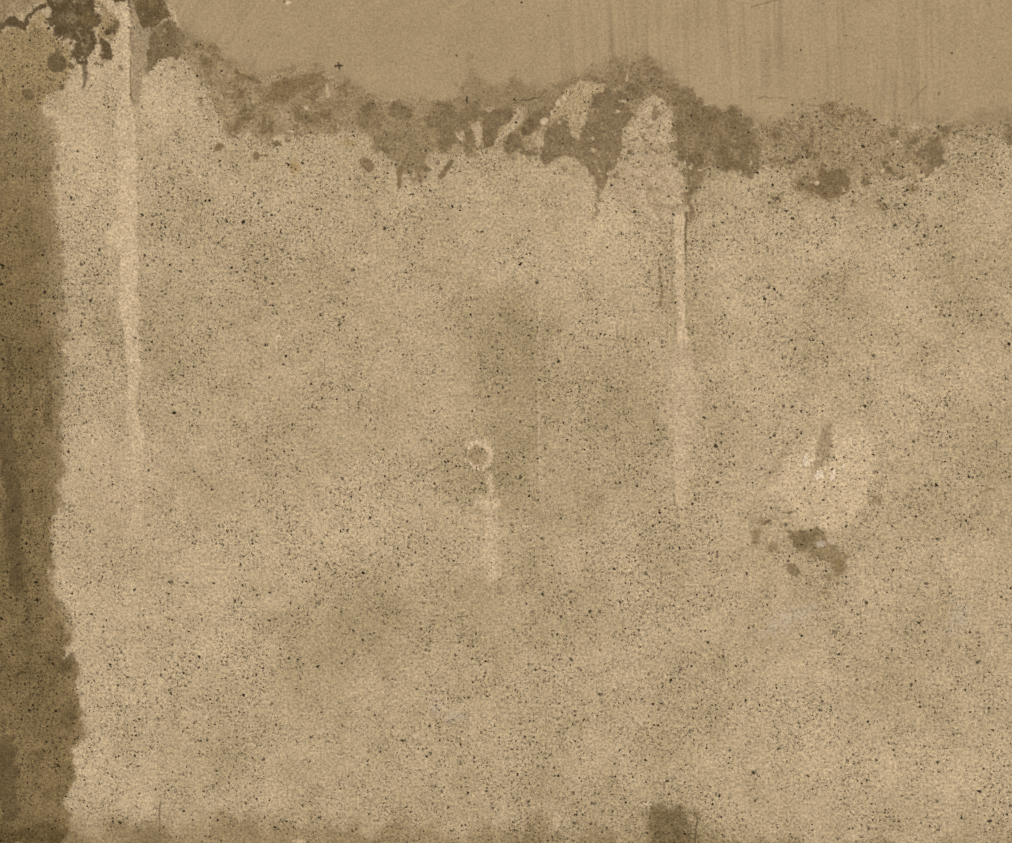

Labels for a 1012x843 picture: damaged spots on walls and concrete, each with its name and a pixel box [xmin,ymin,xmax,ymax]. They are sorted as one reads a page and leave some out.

water stain [103,0,145,530]
water stain [0,105,909,843]
flaking render [0,0,1012,229]